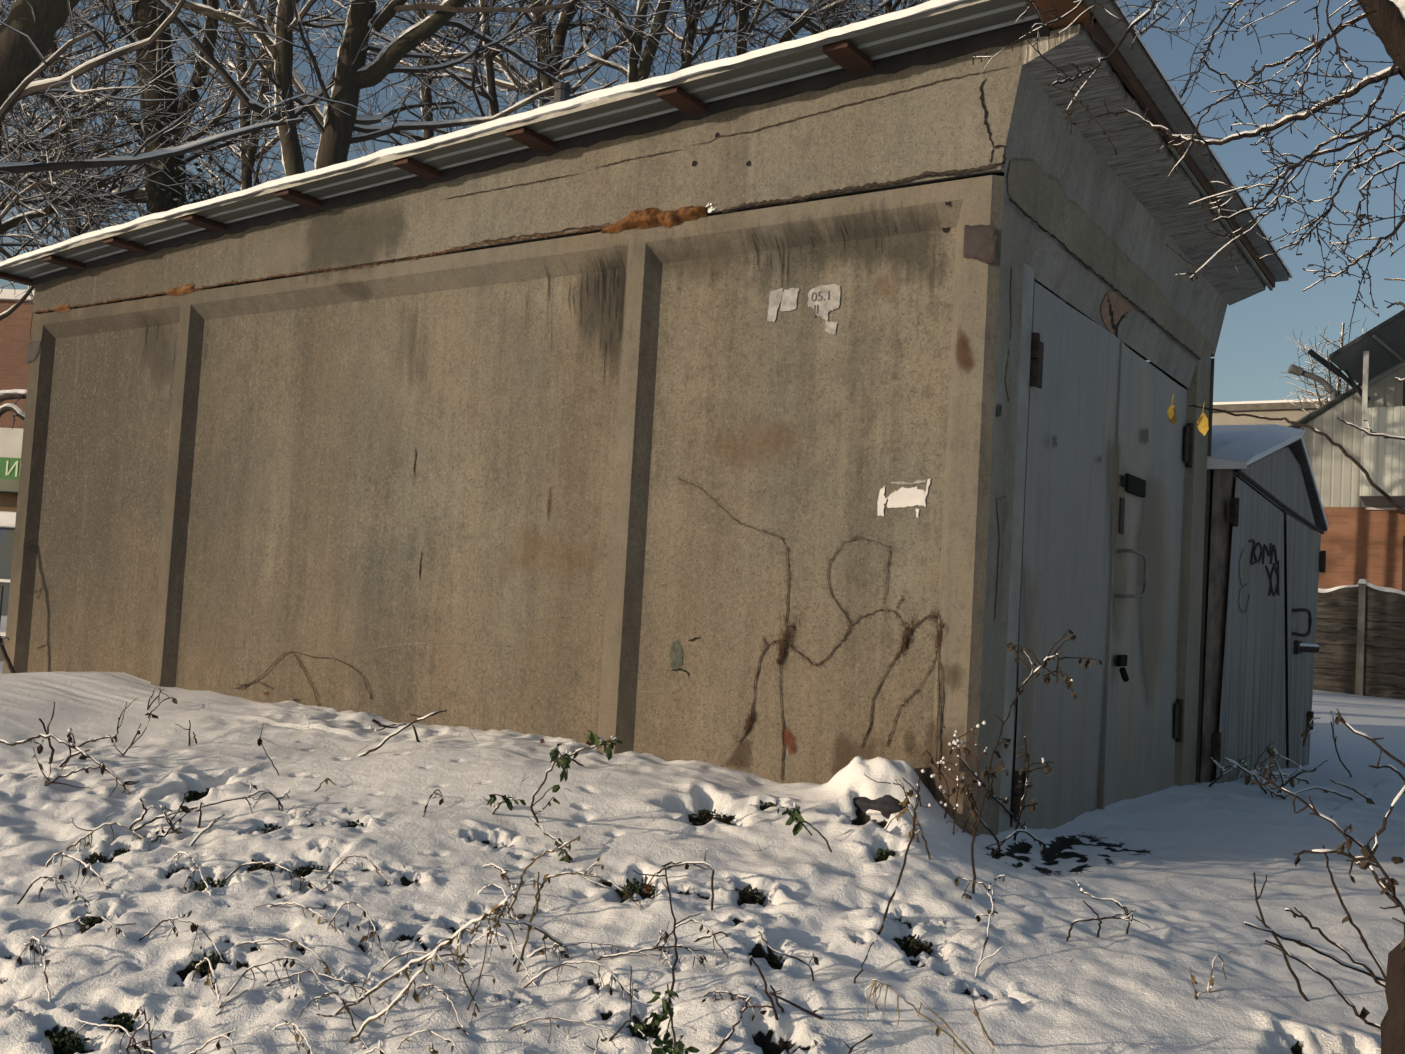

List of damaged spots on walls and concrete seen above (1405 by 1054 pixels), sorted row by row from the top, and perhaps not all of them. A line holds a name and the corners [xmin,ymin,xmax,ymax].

damp [544,256,625,396]
crack [441,64,1200,360]